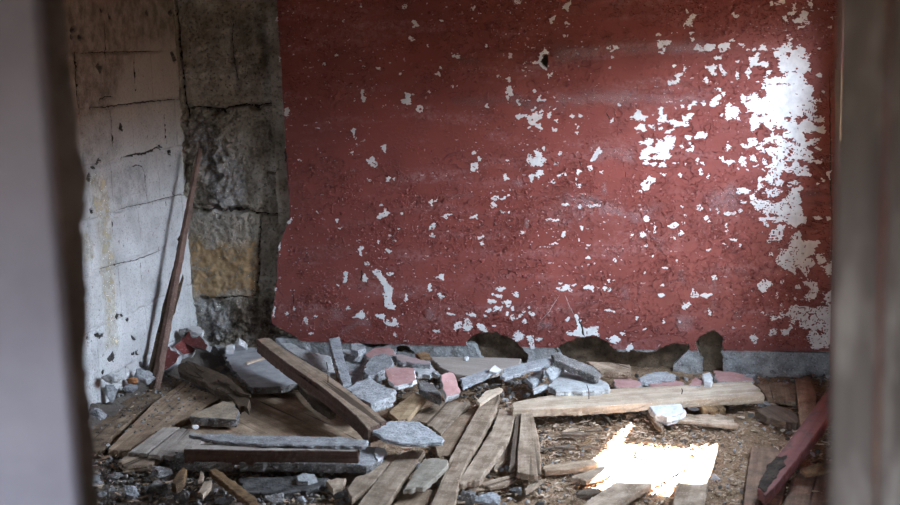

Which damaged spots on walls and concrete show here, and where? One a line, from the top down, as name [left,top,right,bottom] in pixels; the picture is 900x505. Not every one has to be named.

peeling [769,0,813,29]
peeling [523,47,553,79]
crack [74,13,272,232]
peeling [496,75,558,132]
peeling [366,144,386,168]
peeling [527,146,604,209]
peeling [630,9,832,350]
crack [100,249,162,269]
peeling [346,246,412,352]
spalling [447,282,543,362]
peeling [556,279,611,292]
spalling [554,314,724,372]